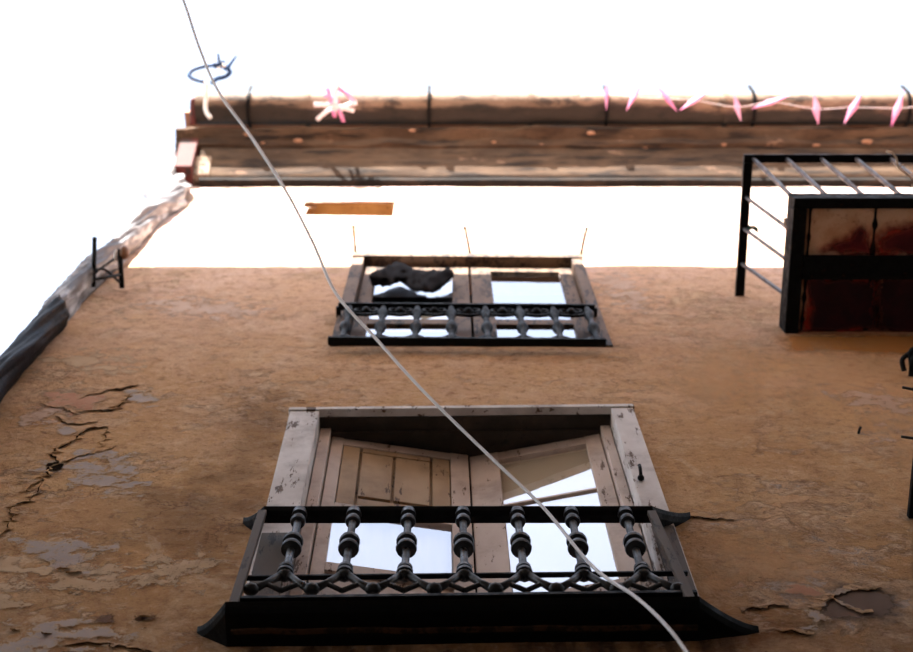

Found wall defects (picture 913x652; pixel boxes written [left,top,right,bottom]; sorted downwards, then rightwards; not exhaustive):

rust [822,225,913,255]
rust [800,280,913,332]
flaking render [18,388,107,437]
crack [0,384,139,536]
peeling [28,446,157,499]
peeling [0,533,220,652]
crack [63,639,177,652]